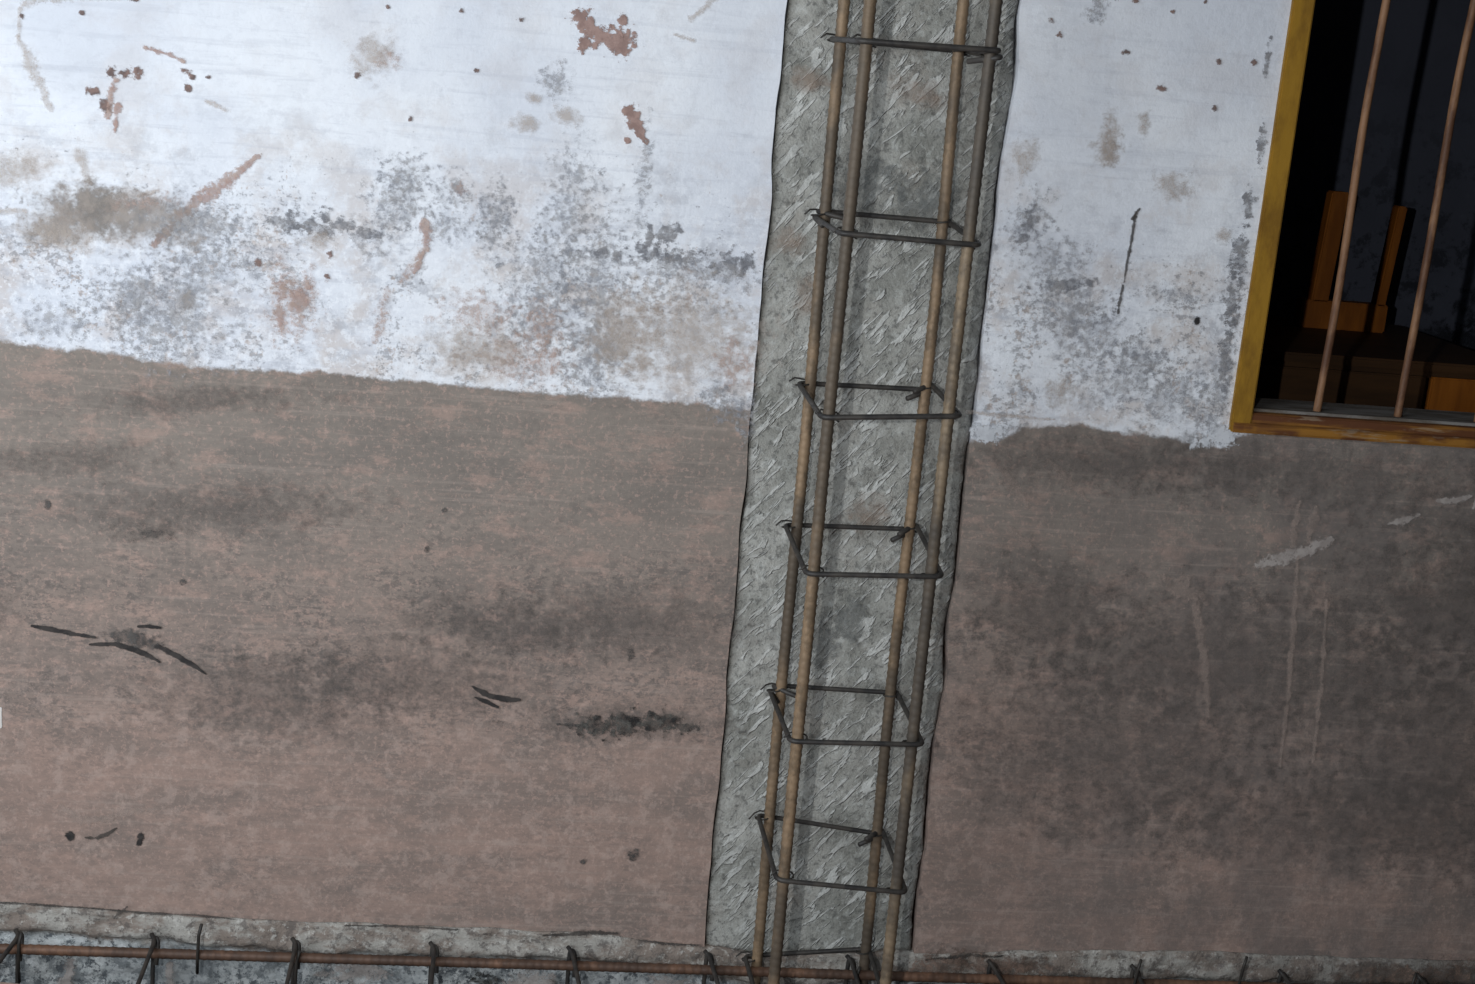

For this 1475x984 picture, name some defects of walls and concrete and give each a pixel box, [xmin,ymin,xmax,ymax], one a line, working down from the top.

damp [28,154,261,248]
damp [373,218,432,343]
damp [443,289,574,379]
damp [595,291,752,391]
spalling [0,0,838,984]
spalling [760,0,1475,984]